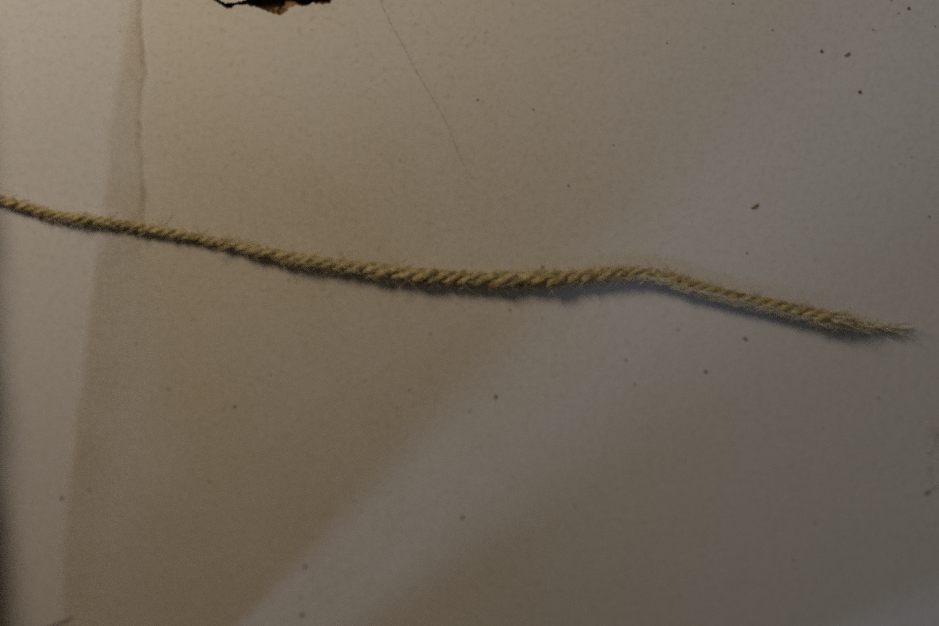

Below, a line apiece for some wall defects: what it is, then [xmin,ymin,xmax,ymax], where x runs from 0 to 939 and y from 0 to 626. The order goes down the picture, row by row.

crack [202,0,350,23]